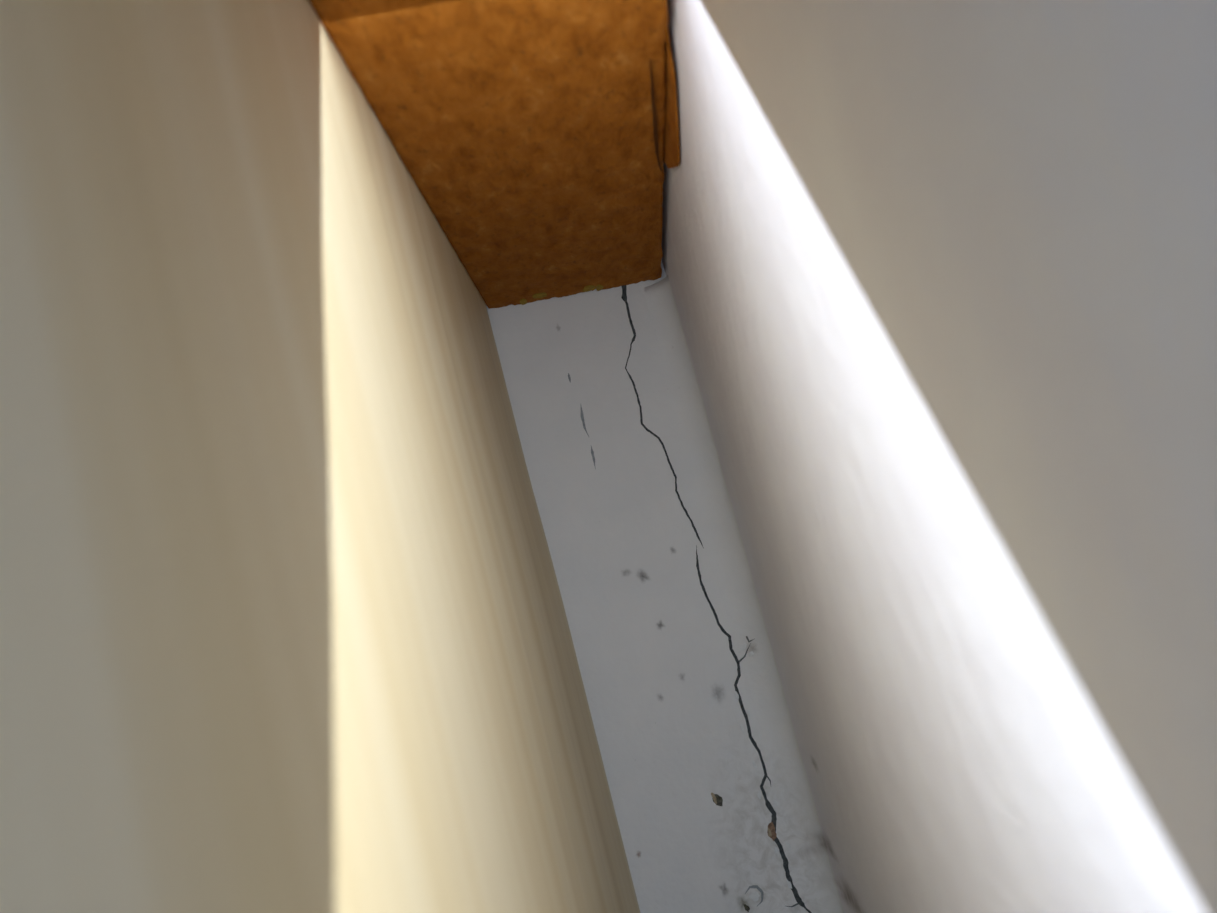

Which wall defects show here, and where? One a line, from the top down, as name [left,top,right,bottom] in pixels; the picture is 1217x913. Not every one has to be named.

crack [621,285,811,913]